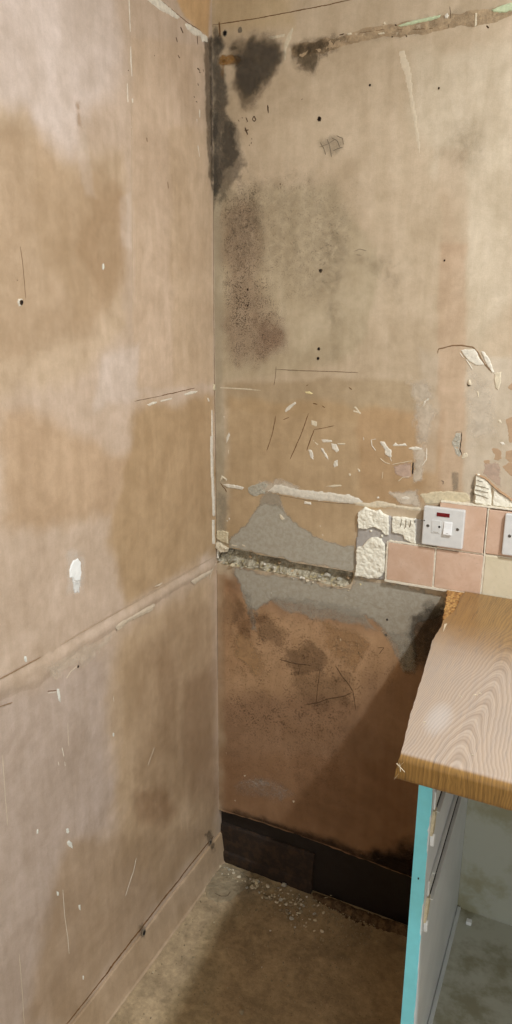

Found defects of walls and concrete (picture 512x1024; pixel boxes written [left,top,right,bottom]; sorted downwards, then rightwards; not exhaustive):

flaking render [268,3,512,60]
leakage [194,38,279,193]
peeling [438,345,512,397]
peeling [363,437,427,481]
peeling [484,417,512,485]
flaking render [210,410,355,591]
leakage [402,607,443,670]
leakage [232,812,414,877]